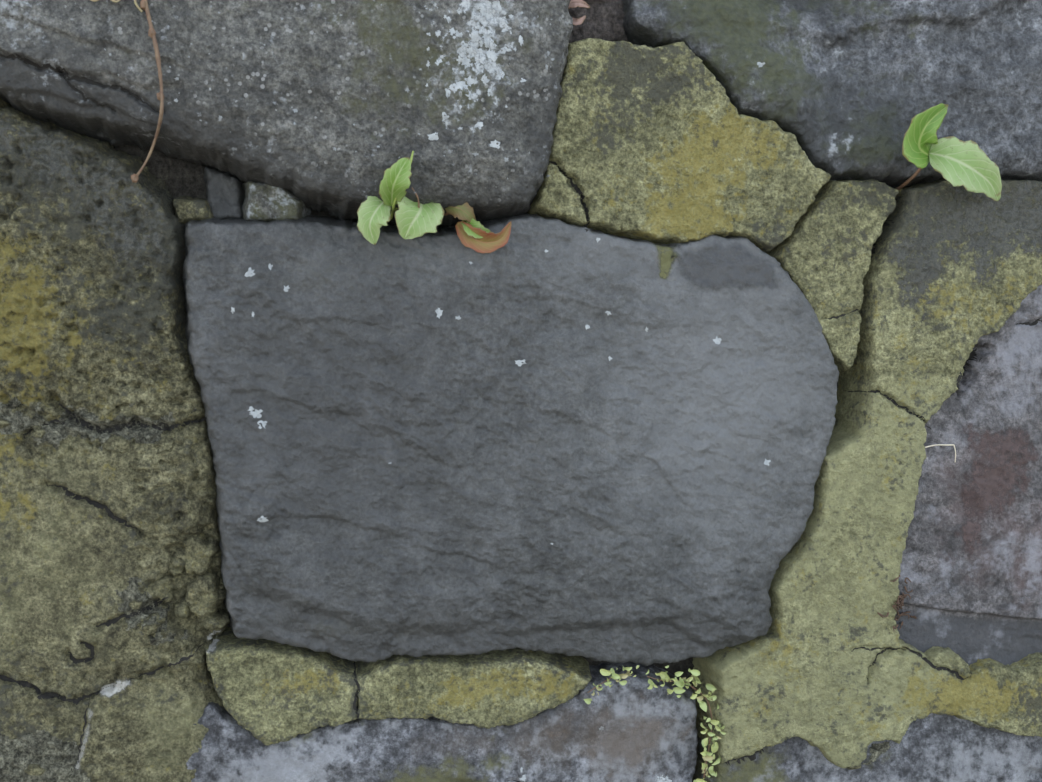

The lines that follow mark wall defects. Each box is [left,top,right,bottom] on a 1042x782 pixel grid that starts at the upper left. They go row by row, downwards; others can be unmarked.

crack [1016,318,1042,326]
crack [23,401,207,439]
crack [46,484,141,533]
crack [68,597,168,664]
crack [851,647,972,680]
crack [0,642,205,778]